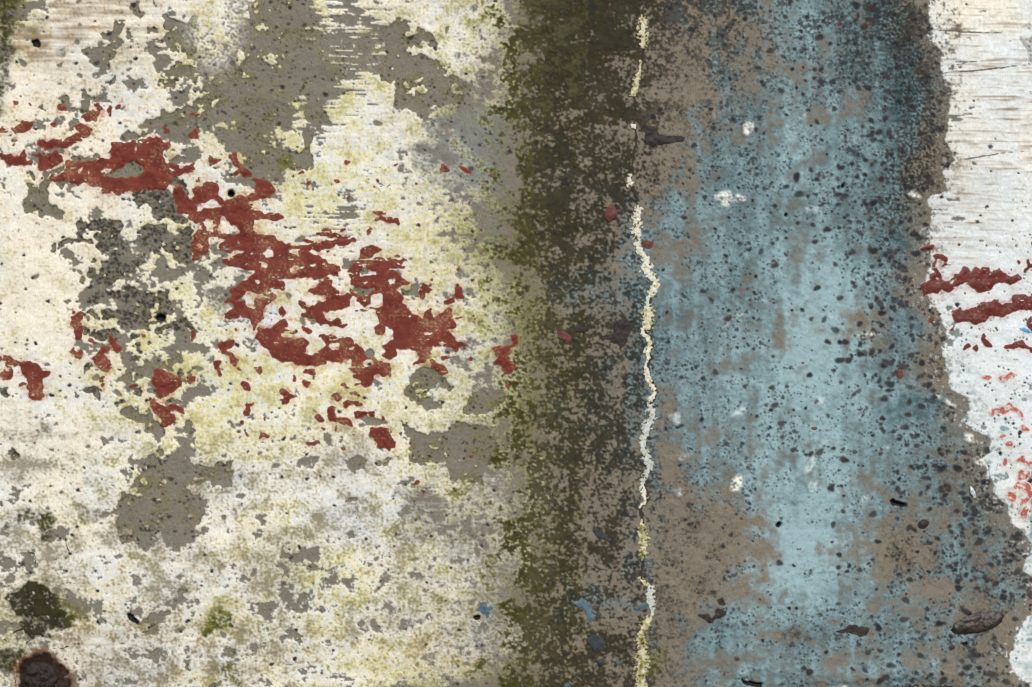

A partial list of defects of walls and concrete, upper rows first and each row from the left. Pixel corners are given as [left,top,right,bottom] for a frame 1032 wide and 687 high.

corrosion [8,644,82,687]
peeling [75,448,234,544]
peeling [0,0,519,483]
peeling [392,480,447,548]
crack [626,0,660,687]
peeling [642,0,1032,669]